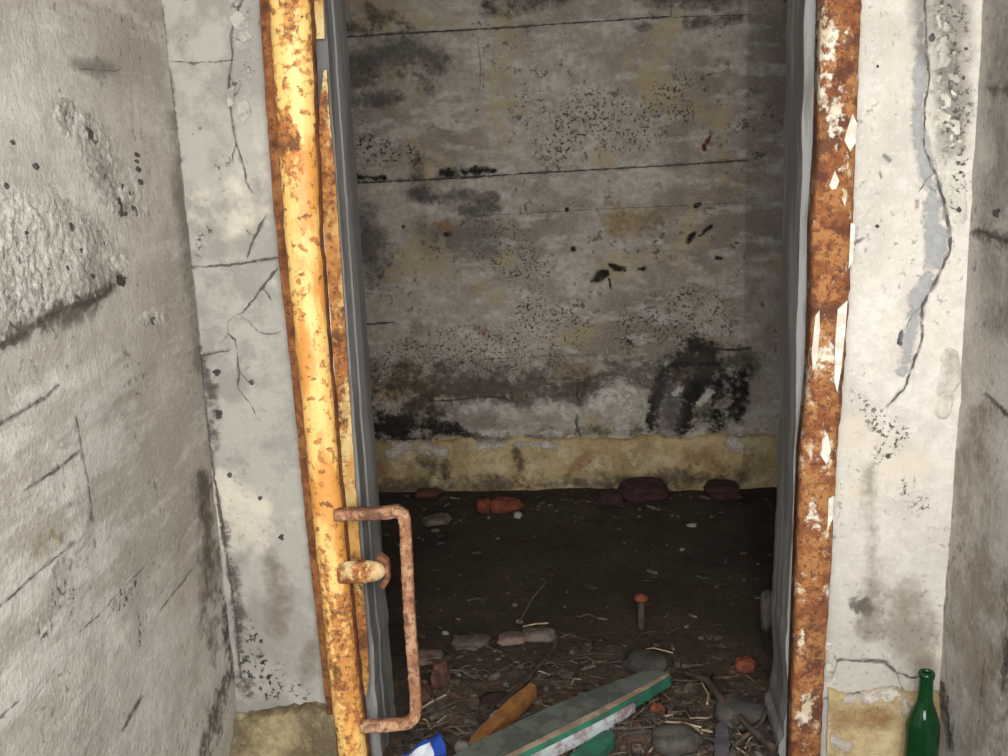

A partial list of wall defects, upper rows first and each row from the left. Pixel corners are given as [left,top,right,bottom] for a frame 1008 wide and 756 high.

crack [162,10,253,193]
water stain [349,26,449,107]
water stain [534,76,695,166]
water stain [355,133,550,284]
water stain [590,263,626,289]
water stain [687,225,713,243]
crack [891,0,973,402]
crack [980,231,1007,243]
crack [191,219,281,677]
water stain [369,287,757,493]